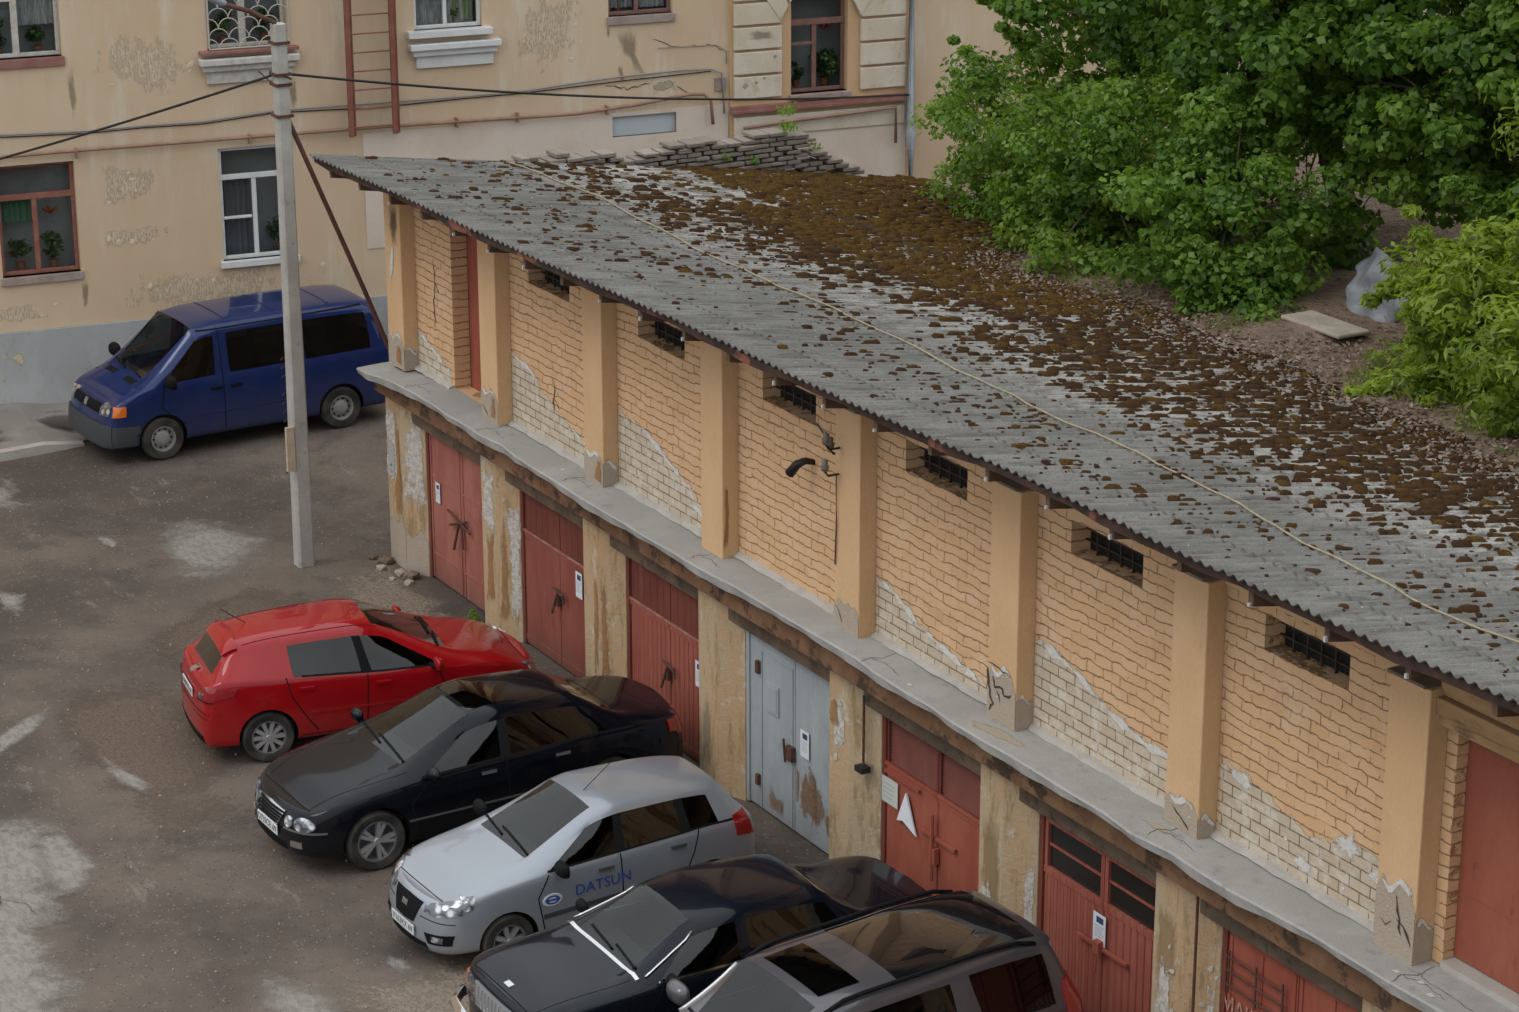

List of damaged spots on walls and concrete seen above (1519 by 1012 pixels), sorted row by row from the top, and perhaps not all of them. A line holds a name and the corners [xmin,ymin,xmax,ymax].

spalling [834,598,858,638]
spalling [833,699,845,761]
rust [769,767,829,835]
flaking render [876,574,1434,966]